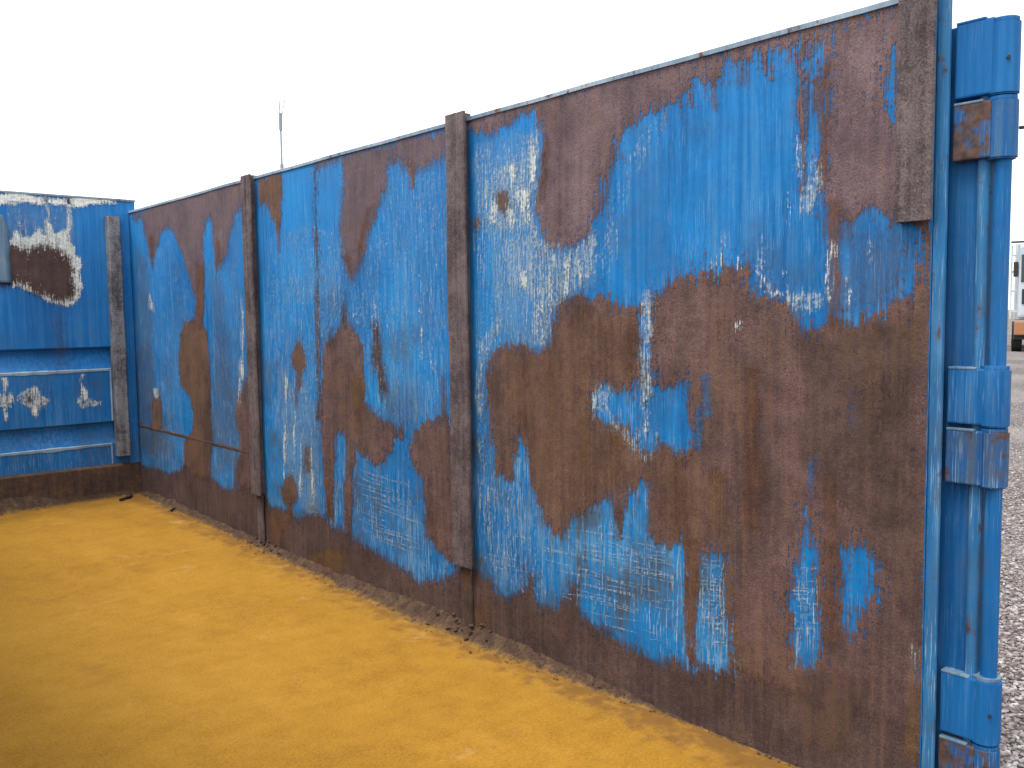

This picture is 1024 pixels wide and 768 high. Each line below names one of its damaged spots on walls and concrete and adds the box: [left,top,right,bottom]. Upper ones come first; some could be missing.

peeling [0,193,118,307]
peeling [482,135,618,345]
peeling [1,377,46,421]
corrosion [130,4,931,768]